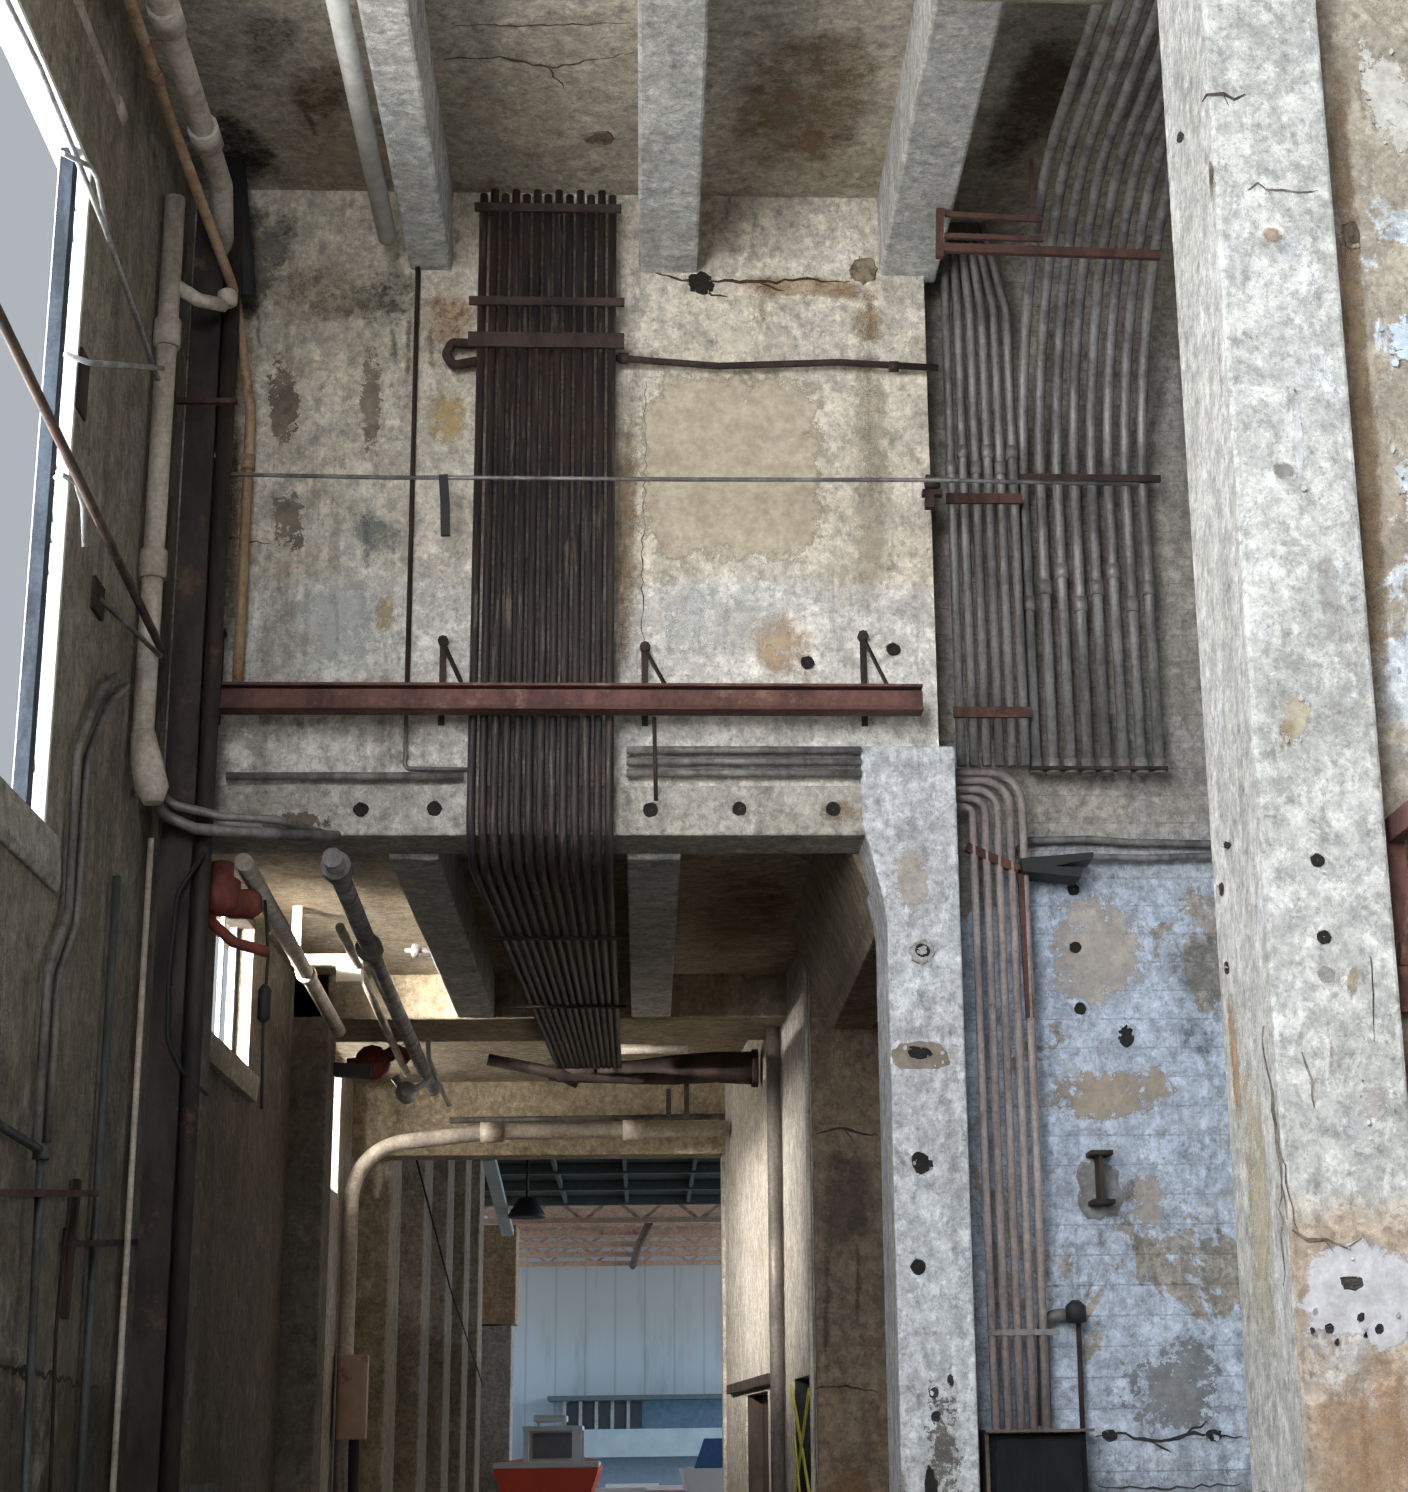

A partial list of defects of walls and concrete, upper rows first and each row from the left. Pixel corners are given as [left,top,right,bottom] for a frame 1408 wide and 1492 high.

crack [444,22,635,88]
water stain [739,34,874,164]
water stain [986,41,1090,165]
peeling [1045,887,1147,1022]
spalling [1118,1024,1134,1048]
peeling [1044,1063,1187,1127]
peeling [1297,1237,1408,1352]
peeling [916,1359,964,1492]
crack [1096,1420,1242,1491]